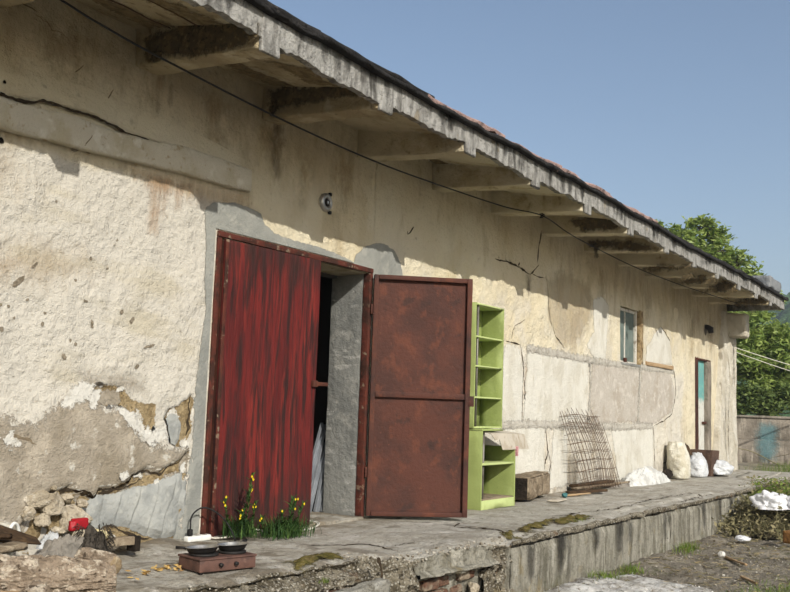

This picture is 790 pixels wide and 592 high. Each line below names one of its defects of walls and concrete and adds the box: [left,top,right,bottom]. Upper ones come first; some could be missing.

crack [496,231,562,344]
peeling [500,297,653,491]
peeling [646,327,672,364]
peeling [0,376,194,539]
flaking render [100,525,155,543]